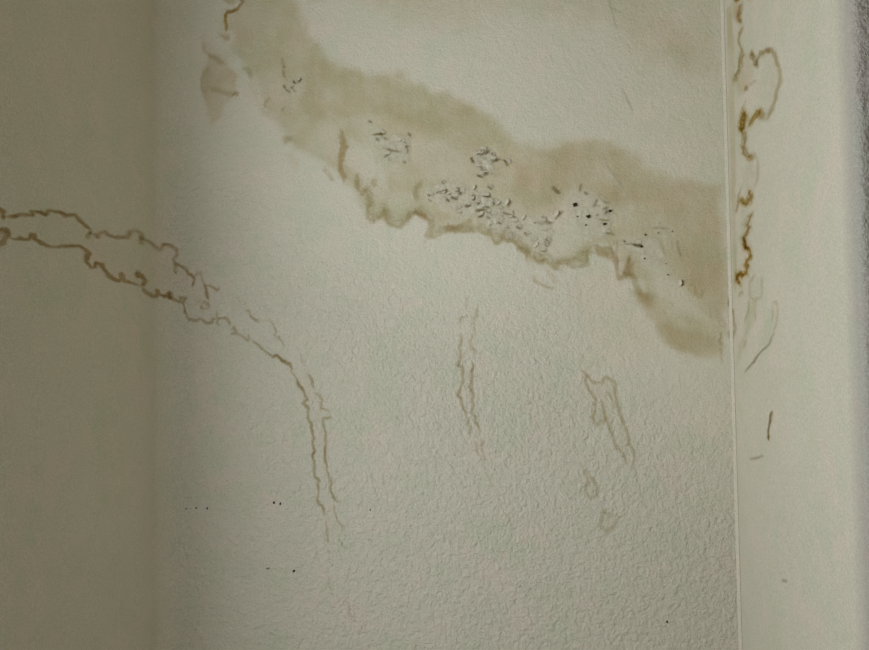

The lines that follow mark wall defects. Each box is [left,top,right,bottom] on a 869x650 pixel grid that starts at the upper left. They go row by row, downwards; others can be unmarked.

peeling [429,146,559,250]